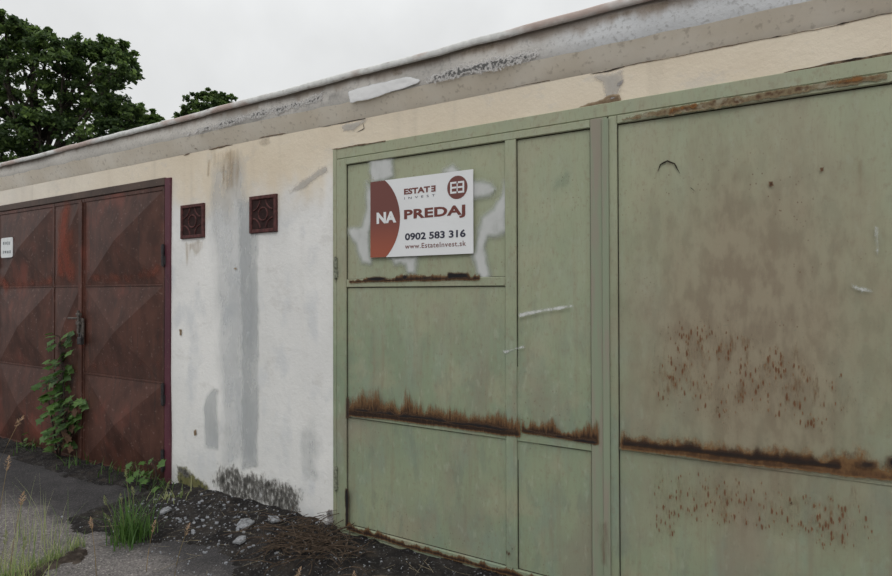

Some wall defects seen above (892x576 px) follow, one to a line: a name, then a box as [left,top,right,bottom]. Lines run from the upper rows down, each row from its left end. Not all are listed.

rust [622,73,888,120]
rust [349,272,480,283]
rust [654,320,842,428]
leakage [212,401,301,512]
rust [346,391,599,445]
rust [620,431,892,481]
rust [345,489,533,576]
rust [654,472,854,551]